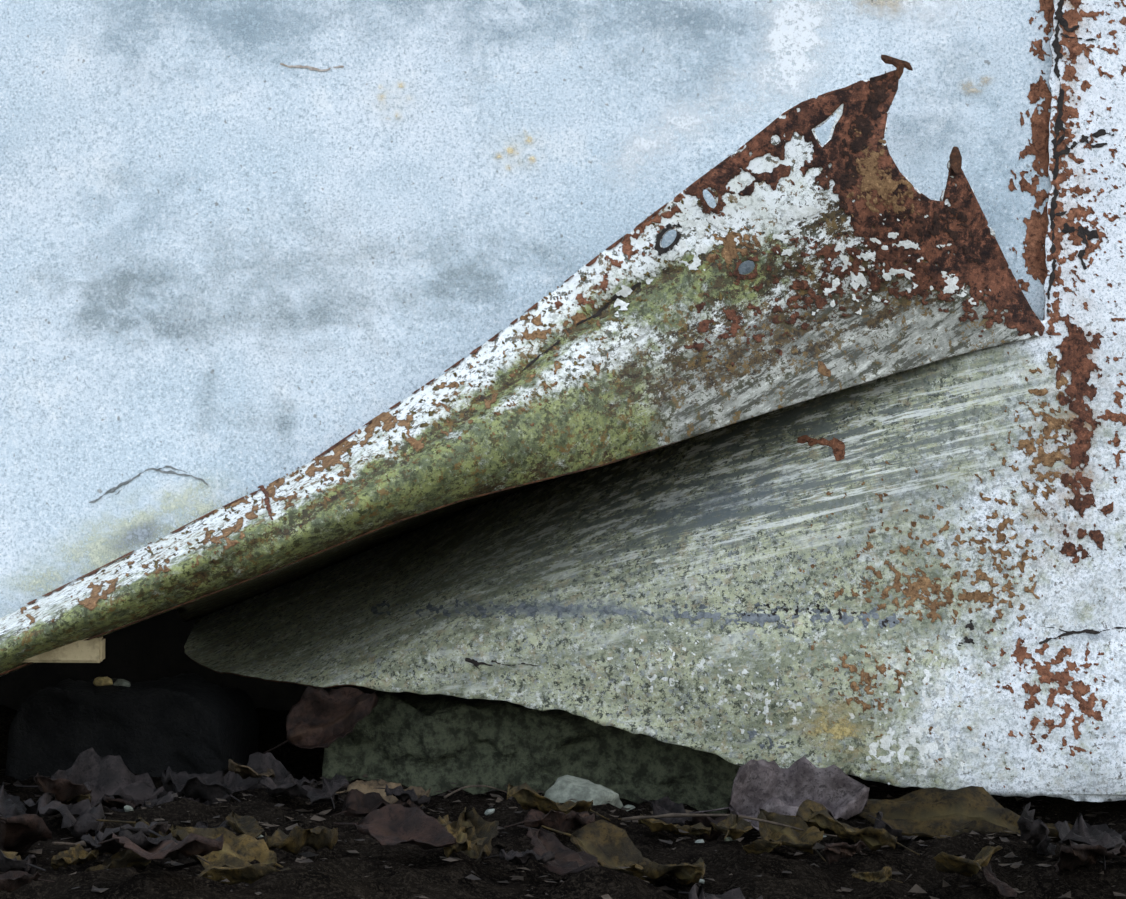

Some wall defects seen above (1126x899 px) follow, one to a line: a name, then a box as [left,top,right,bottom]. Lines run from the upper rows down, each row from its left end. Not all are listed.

water stain [80,271,182,336]
corrosion [20,0,1126,634]
peeling [596,266,656,317]
peeling [649,200,740,271]
peeling [812,214,991,315]
crack [89,465,208,503]
spalling [0,609,377,711]
peeling [371,595,900,749]
corrosion [808,635,940,752]
peeling [848,651,986,785]
corrosion [996,627,1113,757]
crack [1039,626,1126,644]